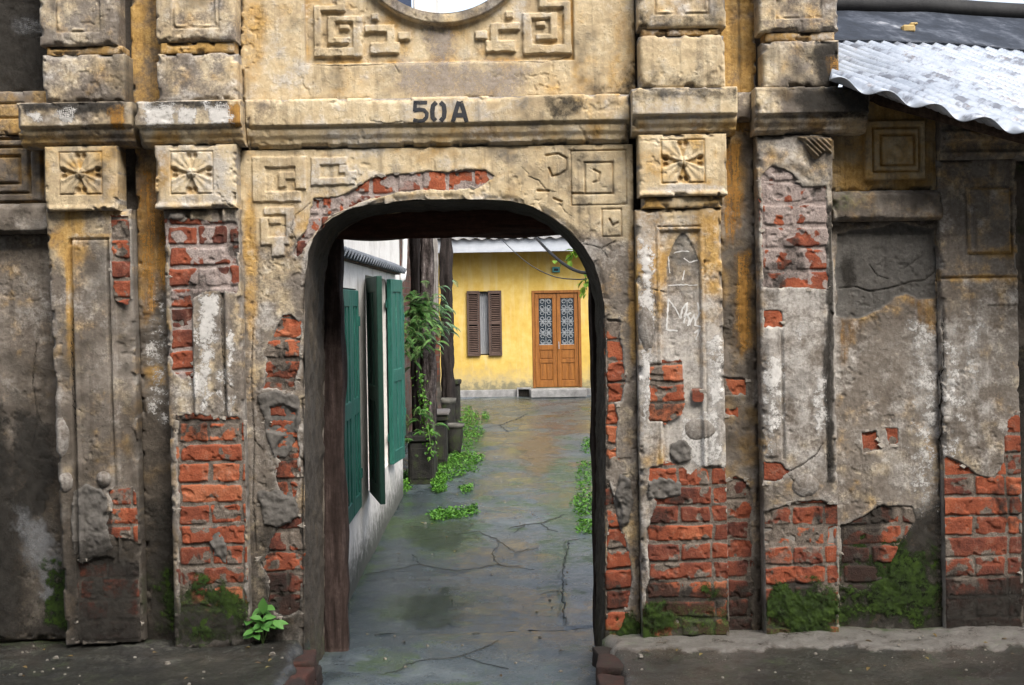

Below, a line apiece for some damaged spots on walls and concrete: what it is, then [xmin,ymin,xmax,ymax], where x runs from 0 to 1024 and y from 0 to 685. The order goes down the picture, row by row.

flaking render [164,217,239,379]
flaking render [294,168,494,257]
flaking render [756,166,831,292]
crack [844,258,930,292]
damp [0,405,313,650]
flaking render [173,411,307,647]
flaking render [264,315,304,497]
crack [365,514,583,674]
flaking render [645,359,708,425]
flaking render [642,461,915,637]
damp [838,322,1024,629]
flaking render [944,411,1023,628]